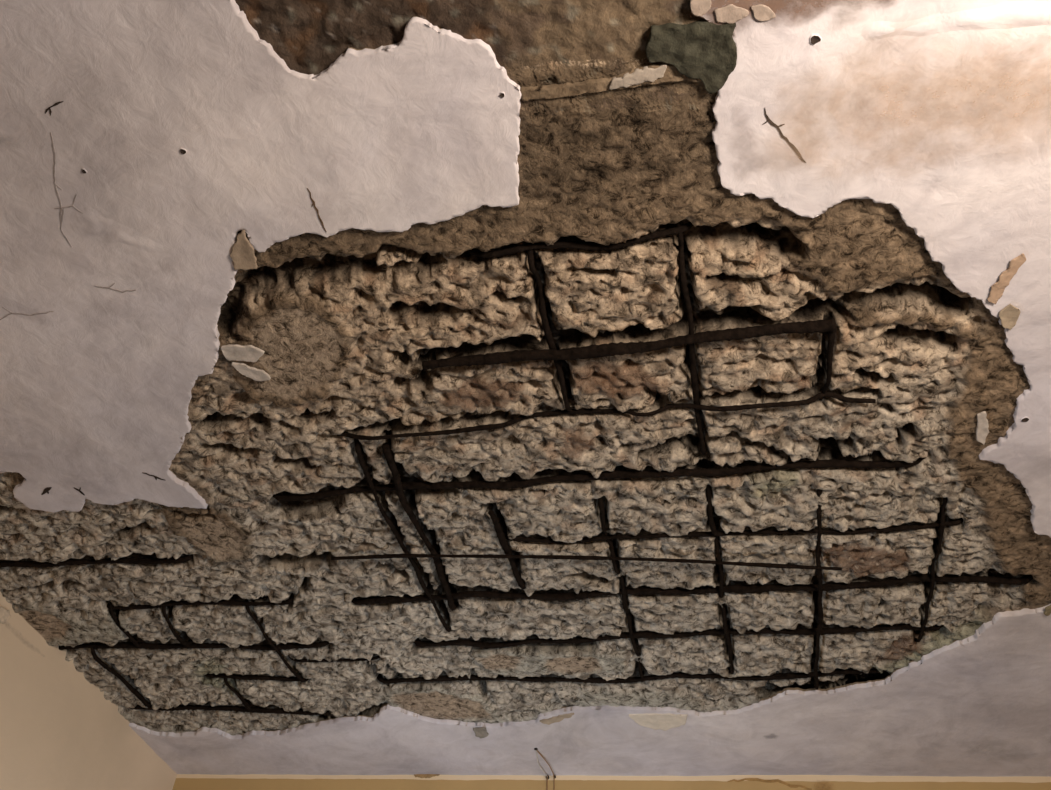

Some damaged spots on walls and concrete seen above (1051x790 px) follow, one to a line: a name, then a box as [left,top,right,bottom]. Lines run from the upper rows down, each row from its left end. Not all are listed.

flaking render [235,0,737,114]
crack [762,110,806,163]
crack [45,101,82,247]
spalling [466,221,694,350]
crack [0,307,54,320]
spalling [422,318,836,413]
spalling [0,554,194,568]
spalling [575,529,818,566]
spalling [820,522,940,629]
spalling [935,573,1033,585]
spalling [413,632,630,649]
spalling [377,672,814,684]